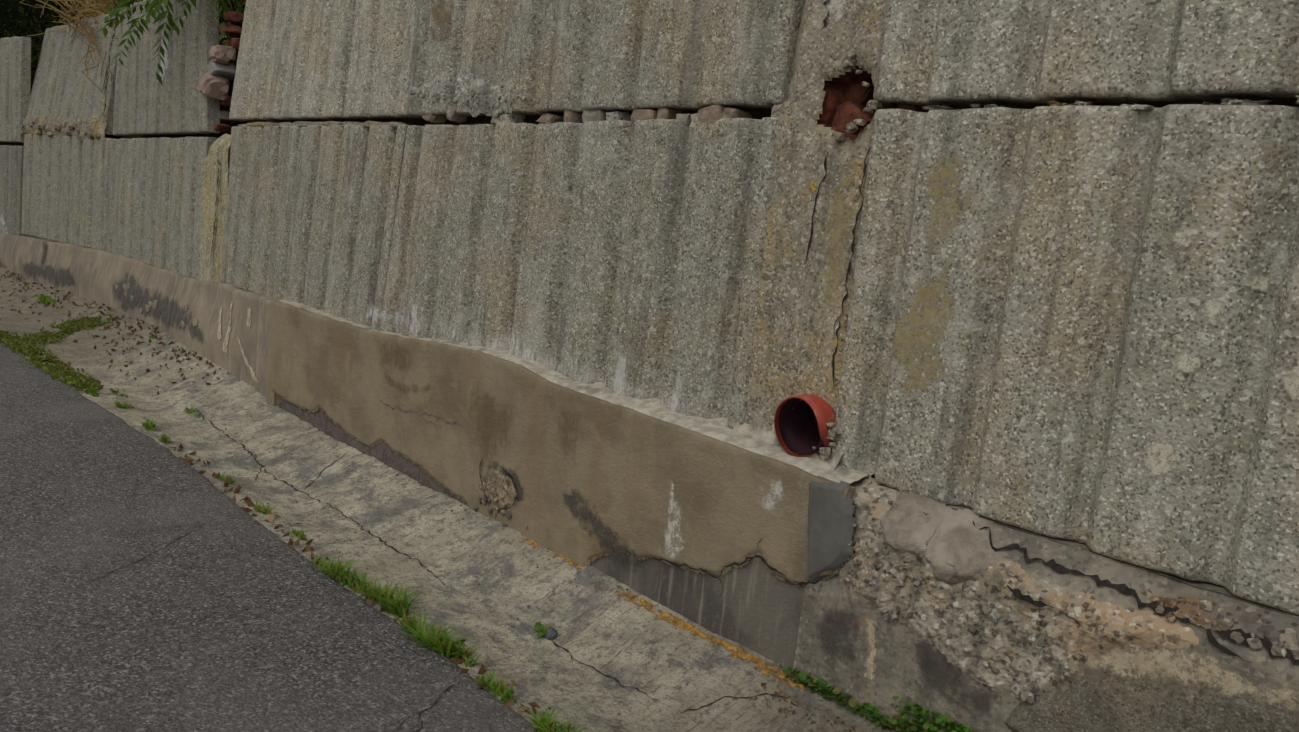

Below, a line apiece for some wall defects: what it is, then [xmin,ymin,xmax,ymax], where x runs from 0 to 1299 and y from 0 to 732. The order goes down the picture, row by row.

spalling [817,53,916,141]
damp [665,484,684,557]
spalling [642,474,1299,704]
crack [973,521,1299,665]
crack [397,679,463,732]
crack [553,641,798,713]